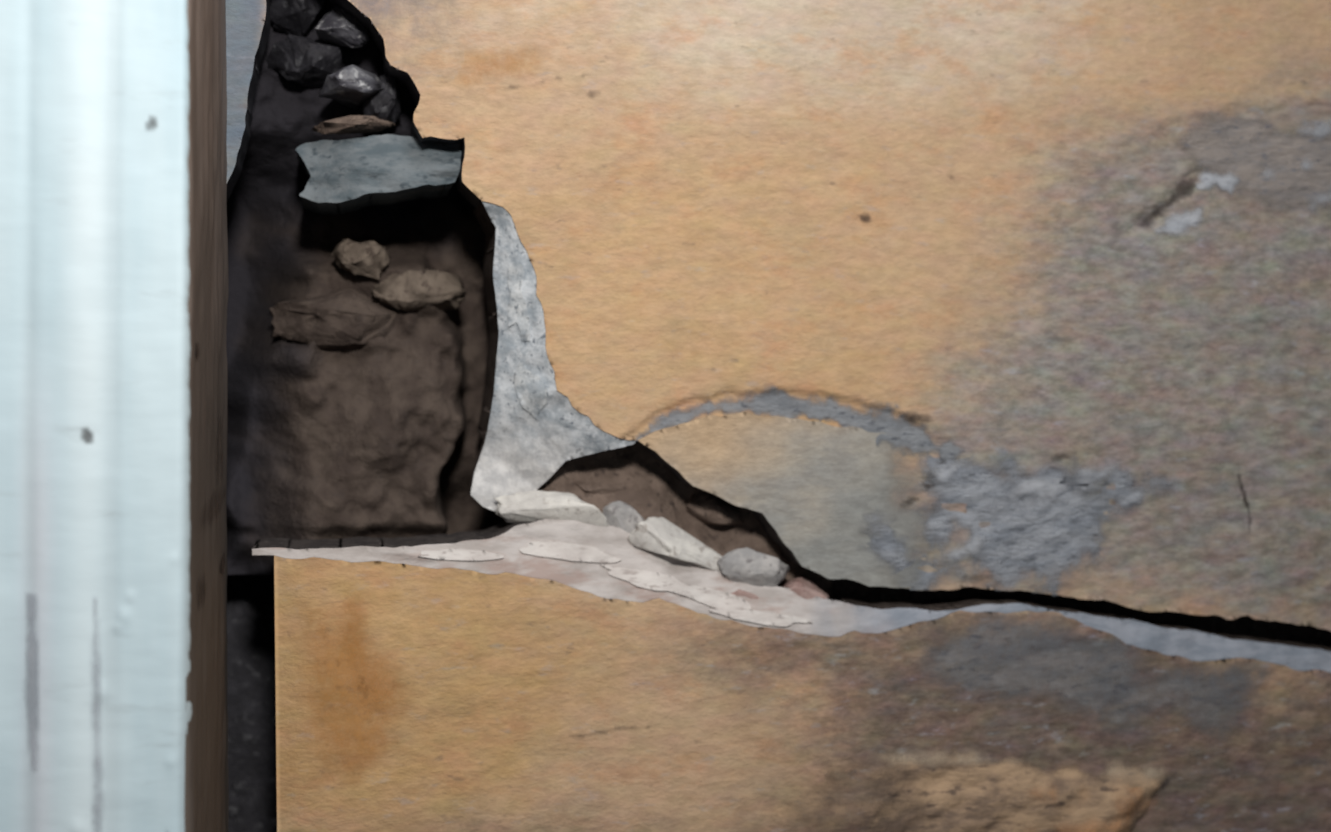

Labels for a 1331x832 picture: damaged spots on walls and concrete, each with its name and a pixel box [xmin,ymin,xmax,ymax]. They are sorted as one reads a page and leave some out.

spalling [226,0,1331,673]
crack [537,442,1331,646]